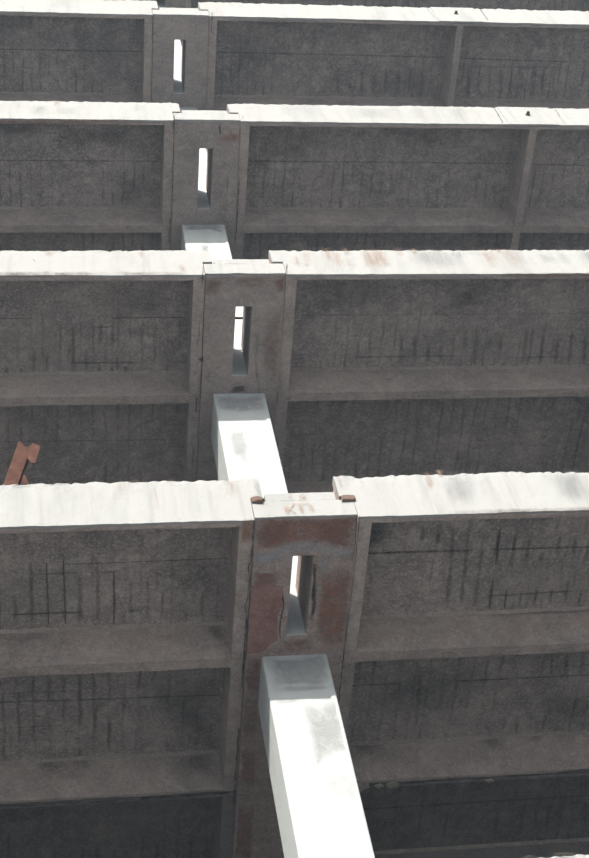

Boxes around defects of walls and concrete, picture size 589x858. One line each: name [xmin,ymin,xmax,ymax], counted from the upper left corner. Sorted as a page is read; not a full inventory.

corrosion [264,503,351,547]